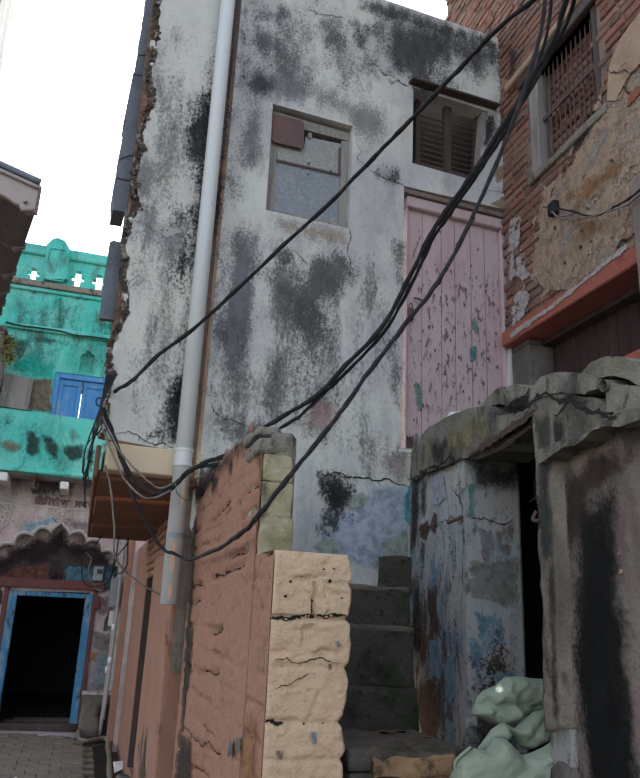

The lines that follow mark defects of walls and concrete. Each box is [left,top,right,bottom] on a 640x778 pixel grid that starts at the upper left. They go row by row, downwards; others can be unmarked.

damp [233,1,515,135]
crack [609,62,640,99]
spalling [97,0,162,438]
damp [135,70,214,290]
peeling [513,85,640,299]
flaking render [0,441,20,451]
damp [139,301,189,444]
crack [274,657,337,689]
damp [263,249,379,429]
peeling [314,475,519,753]
crack [325,444,513,618]
damp [564,427,640,778]